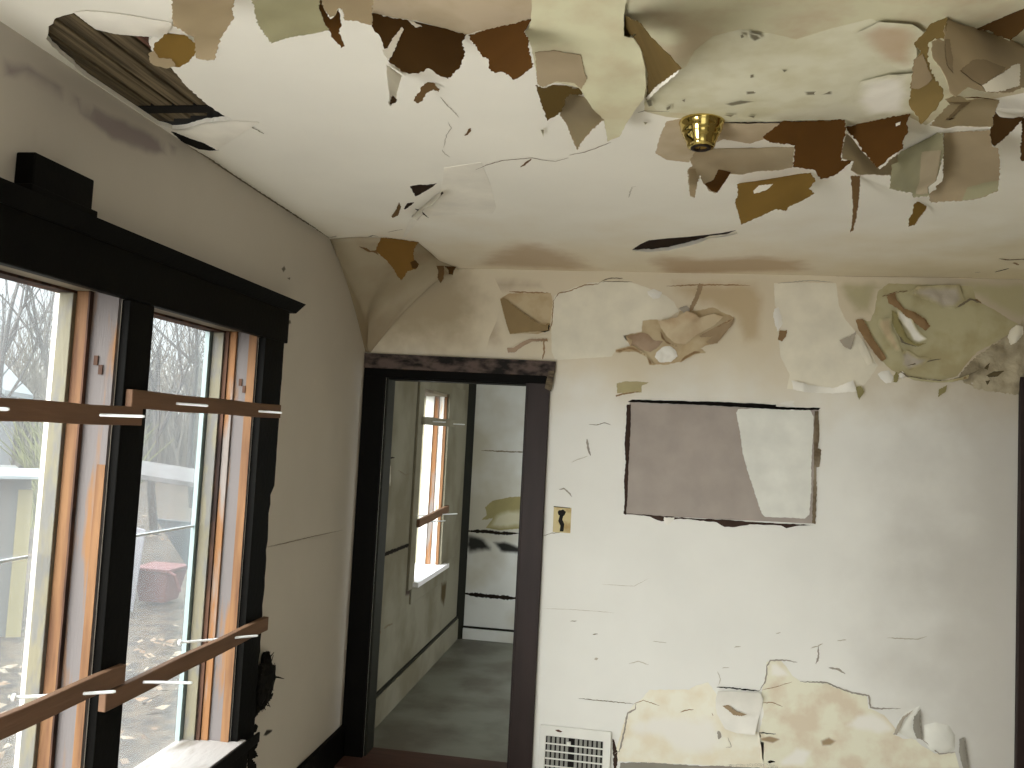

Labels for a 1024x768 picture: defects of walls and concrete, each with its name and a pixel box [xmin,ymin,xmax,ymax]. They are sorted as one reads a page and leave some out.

peeling [74,10,172,38]
flaking render [372,0,532,34]
flaking render [625,0,1024,144]
spalling [162,113,224,125]
crack [441,98,471,156]
crack [476,142,611,170]
flaking render [641,50,695,162]
peeling [616,307,734,365]
peeling [856,283,1024,395]
crack [718,639,845,706]